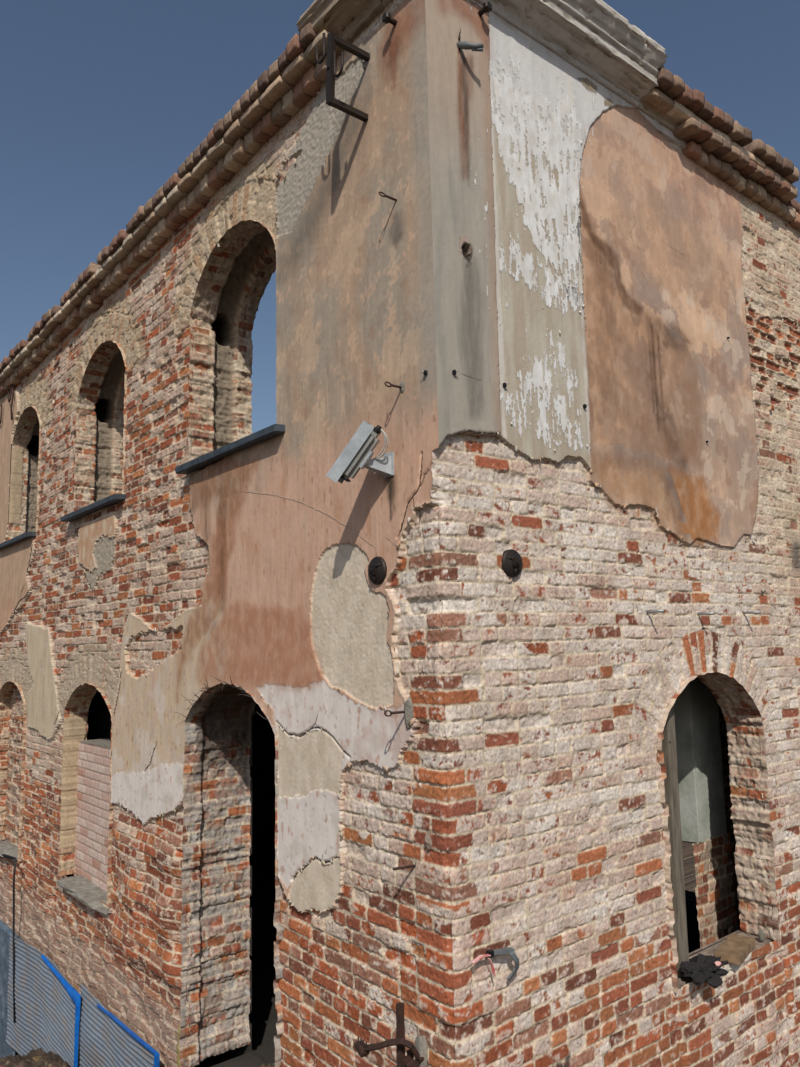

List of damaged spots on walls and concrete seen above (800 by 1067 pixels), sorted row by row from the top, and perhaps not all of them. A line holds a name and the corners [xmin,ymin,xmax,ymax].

peeling [460,51,612,315]
spalling [744,293,800,411]
crack [398,453,435,536]
flaking render [124,625,183,677]
flaking render [256,328,766,947]